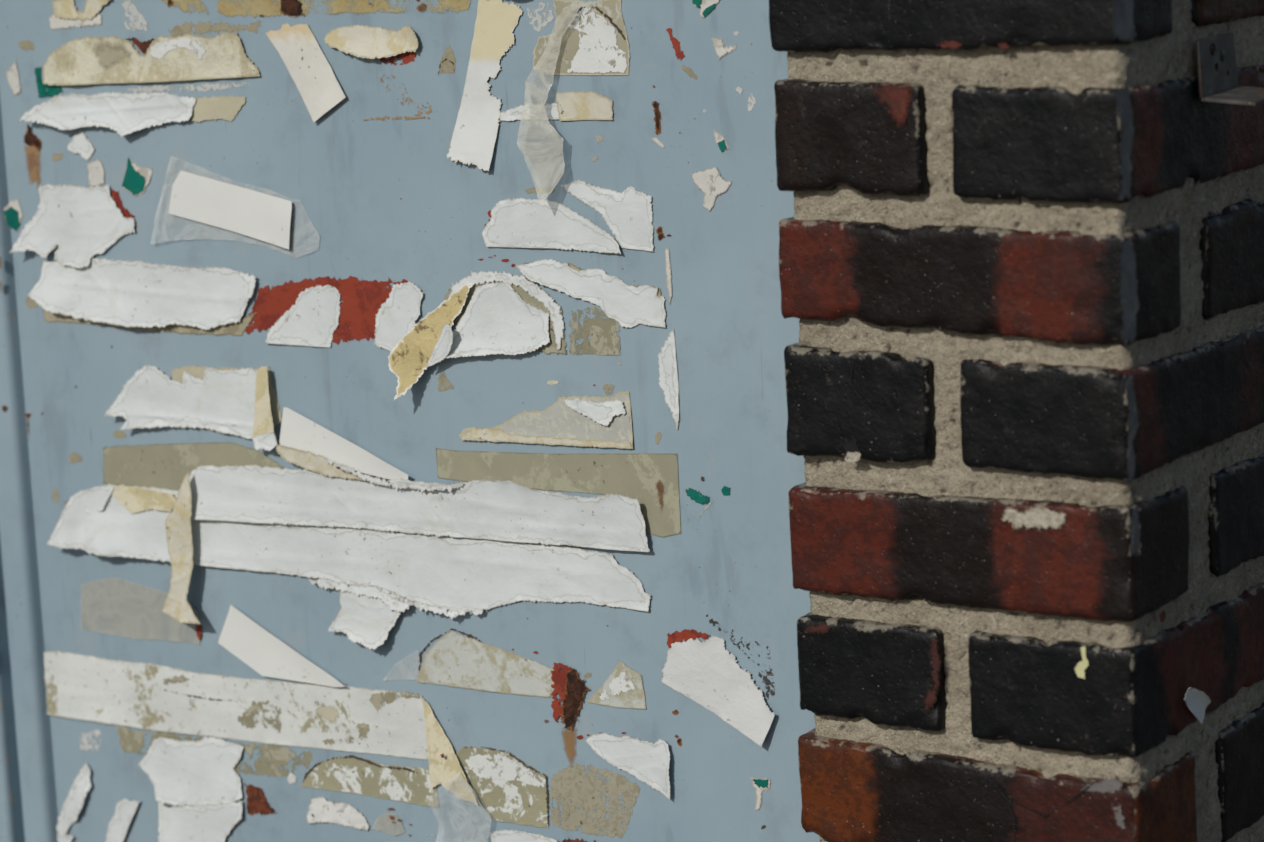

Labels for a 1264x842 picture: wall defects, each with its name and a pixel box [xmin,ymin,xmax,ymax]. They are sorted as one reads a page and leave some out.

rust [280,0,305,17]
peeling [667,629,710,648]
rust [544,663,591,762]